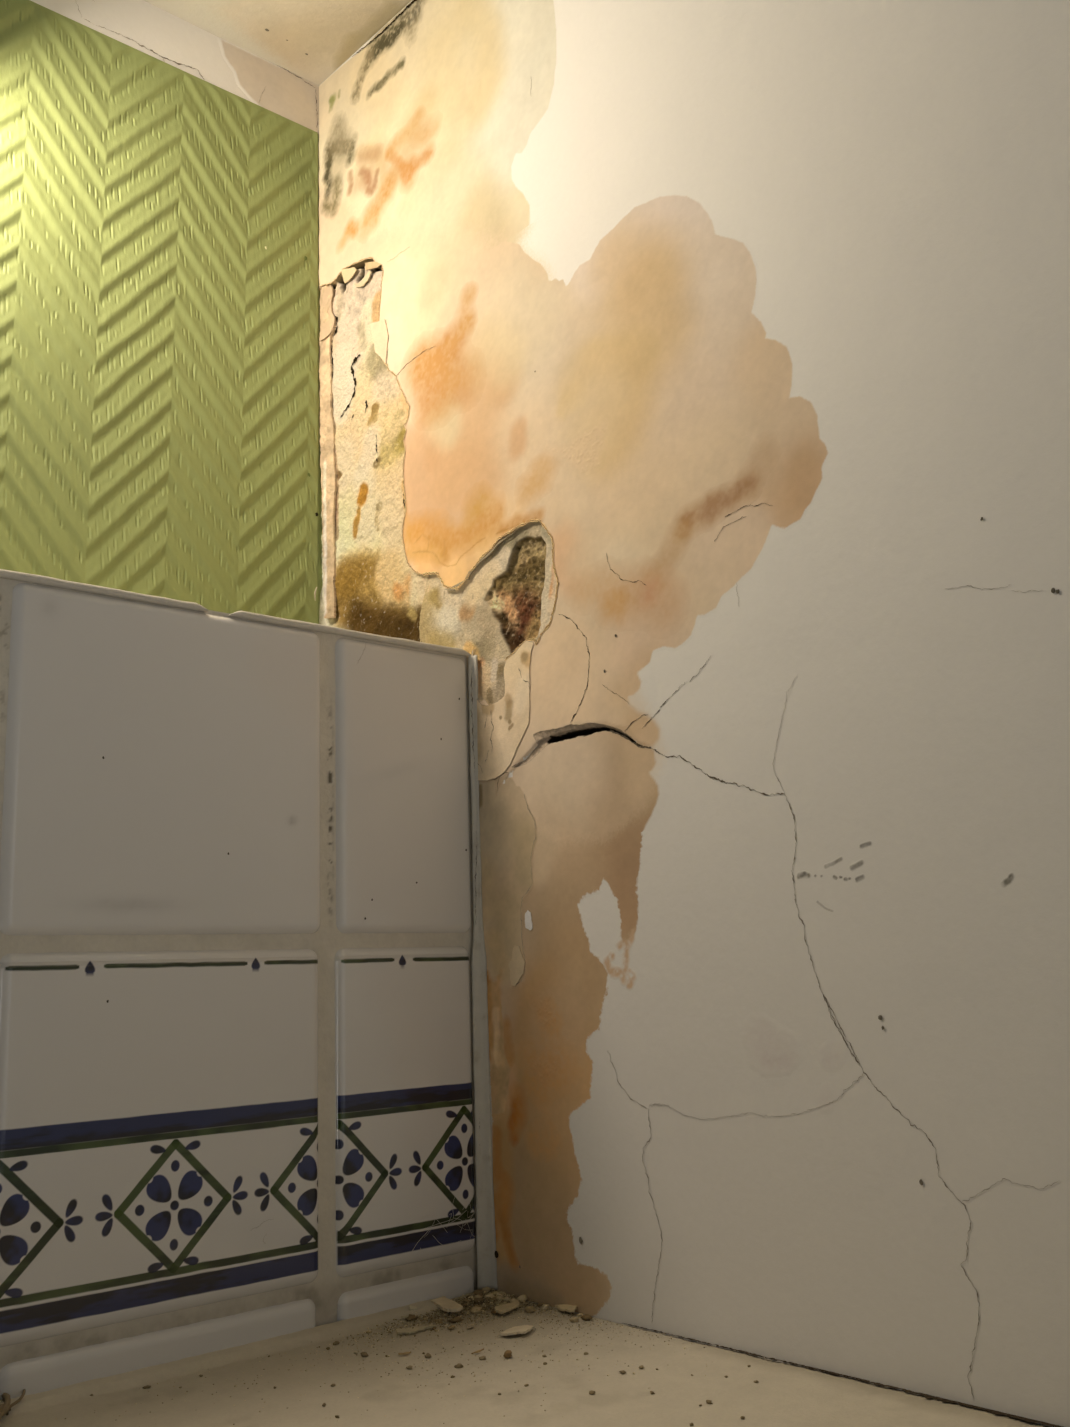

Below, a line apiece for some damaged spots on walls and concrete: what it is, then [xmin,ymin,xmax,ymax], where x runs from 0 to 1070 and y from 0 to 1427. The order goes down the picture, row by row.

flaking render [319,257,559,1116]
water stain [186,0,831,668]
water stain [490,830,645,1317]
crack [477,614,1063,1427]